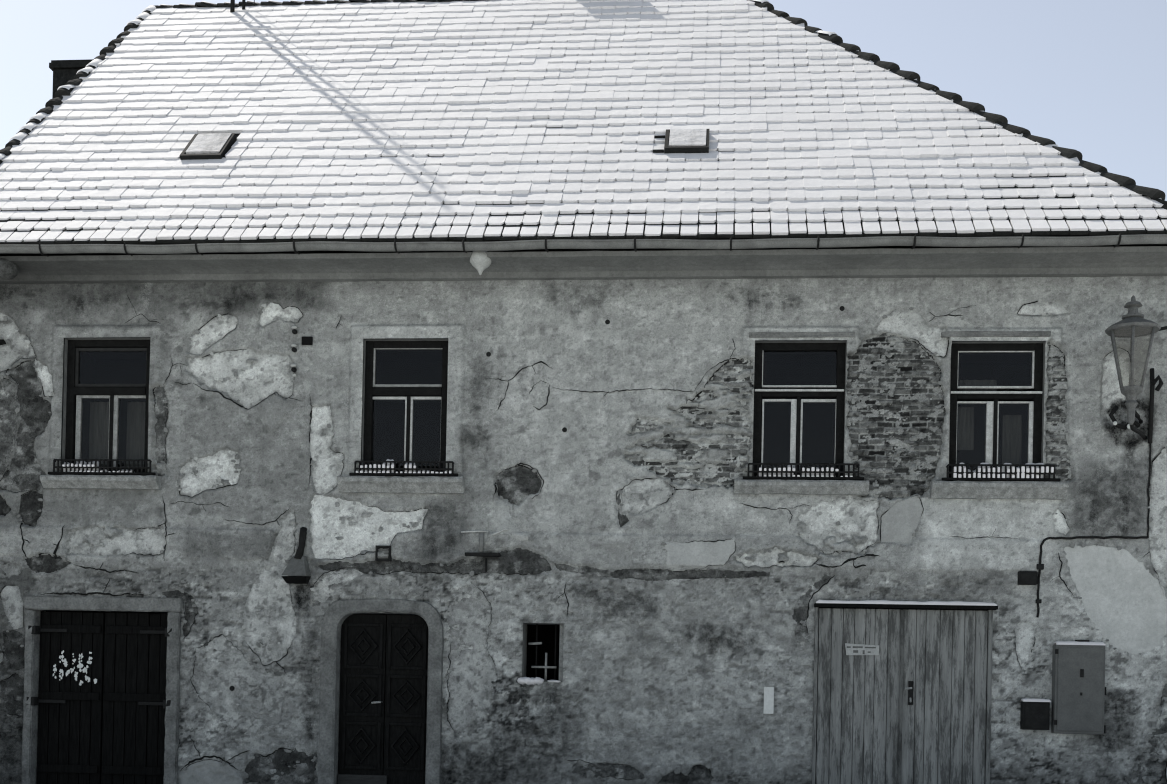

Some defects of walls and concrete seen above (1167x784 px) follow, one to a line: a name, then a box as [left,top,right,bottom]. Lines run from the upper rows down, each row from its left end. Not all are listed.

flaking render [259,303,303,326]
spalling [0,312,54,527]
spalling [153,385,169,476]
crack [490,341,737,410]
flaking render [1045,342,1074,482]
crack [20,523,150,596]
crack [158,497,289,561]
flaking render [162,307,949,737]
crack [739,503,809,524]
crack [815,510,888,568]
flaking render [1053,447,1167,655]